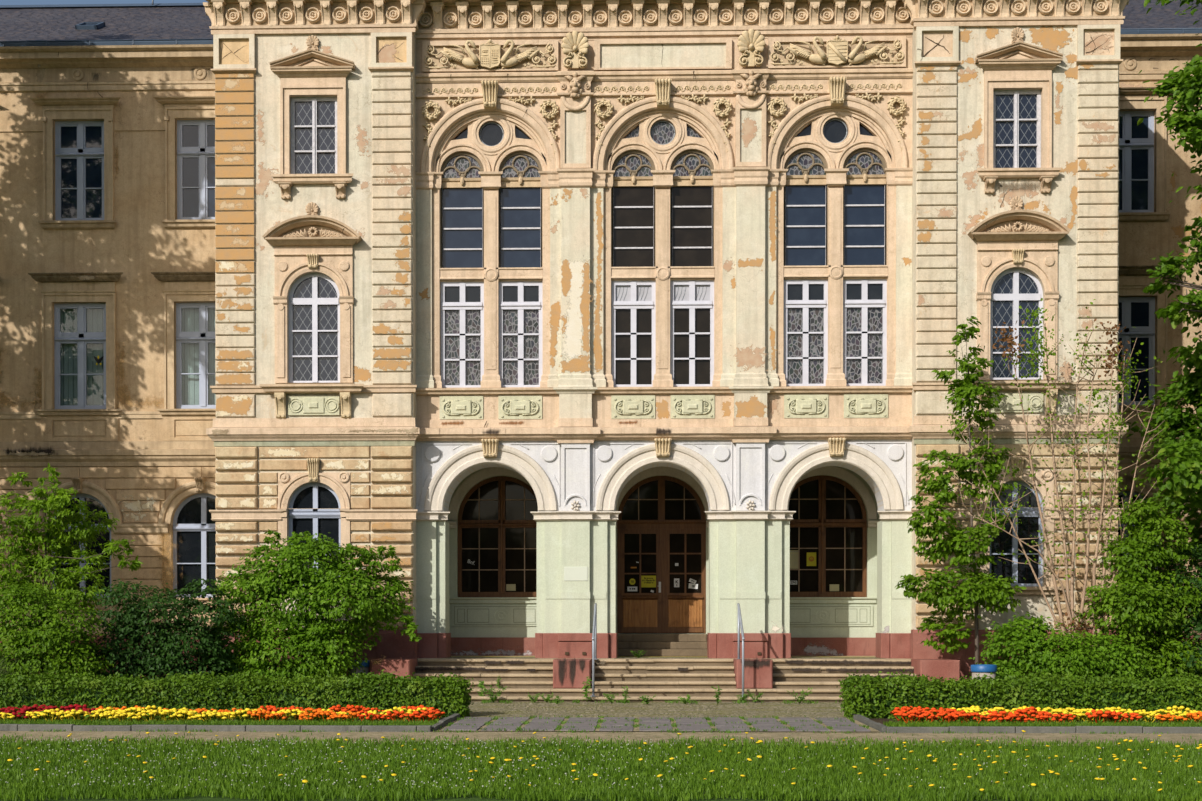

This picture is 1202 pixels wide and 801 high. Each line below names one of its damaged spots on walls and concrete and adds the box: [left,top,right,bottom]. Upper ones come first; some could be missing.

flaking render [1026,26,1094,125]
flaking render [215,73,280,333]
flaking render [353,165,430,382]
flaking render [547,188,605,374]
flaking render [723,190,778,288]
flaking render [957,115,984,192]
flaking render [1024,159,1116,230]
flaking render [212,349,254,435]
peeling [217,447,306,508]
peeling [325,460,410,494]
peeling [216,523,253,553]
flaking render [388,558,411,576]